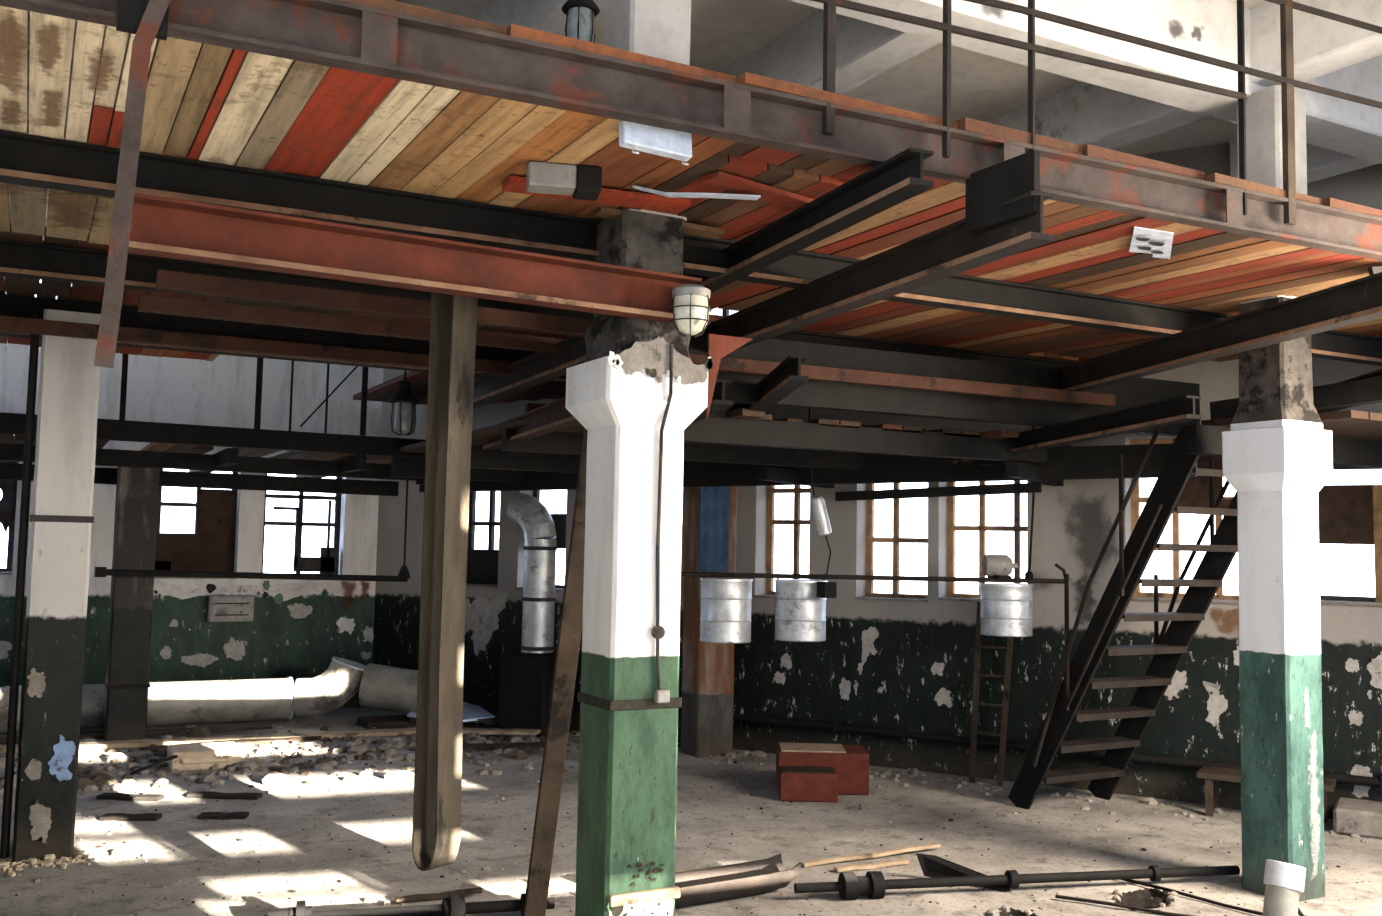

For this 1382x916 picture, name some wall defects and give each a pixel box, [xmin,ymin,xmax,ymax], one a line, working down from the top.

leakage [0,10,62,127]
leakage [87,48,114,91]
spalling [607,331,714,386]
peeling [154,580,371,619]
peeling [160,637,246,668]
peeling [838,627,879,700]
peeling [931,661,953,708]
peeling [1345,651,1382,726]
peeling [25,735,76,782]
peeling [1347,764,1373,798]
peeling [29,799,52,843]
peeling [606,899,673,916]